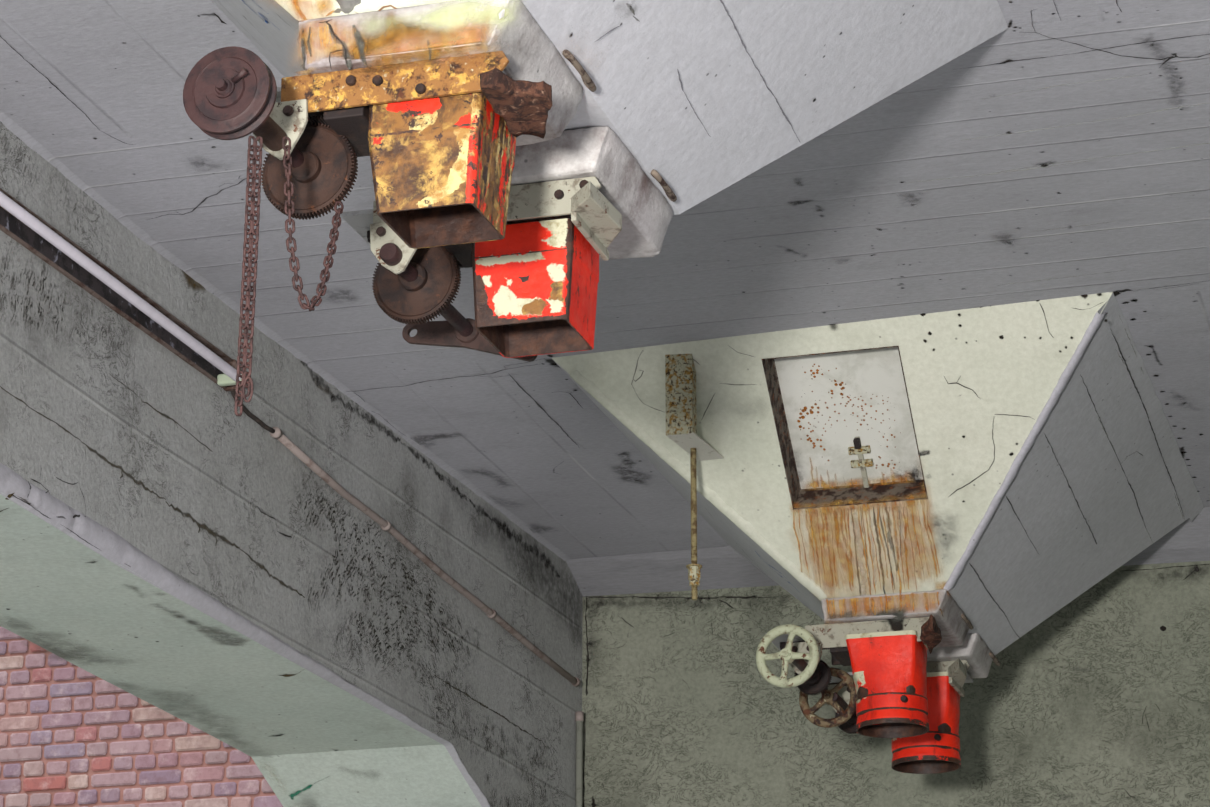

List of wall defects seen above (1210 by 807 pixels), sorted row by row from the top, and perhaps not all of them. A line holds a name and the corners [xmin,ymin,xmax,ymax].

crack [0,36,127,144]
crack [677,69,710,136]
crack [720,0,800,142]
crack [960,0,1210,69]
crack [148,172,262,220]
water stain [183,271,204,289]
crack [0,357,305,598]
water stain [301,361,560,577]
corrosion [797,364,907,485]
crack [1074,281,1204,528]
corrosion [793,496,945,617]